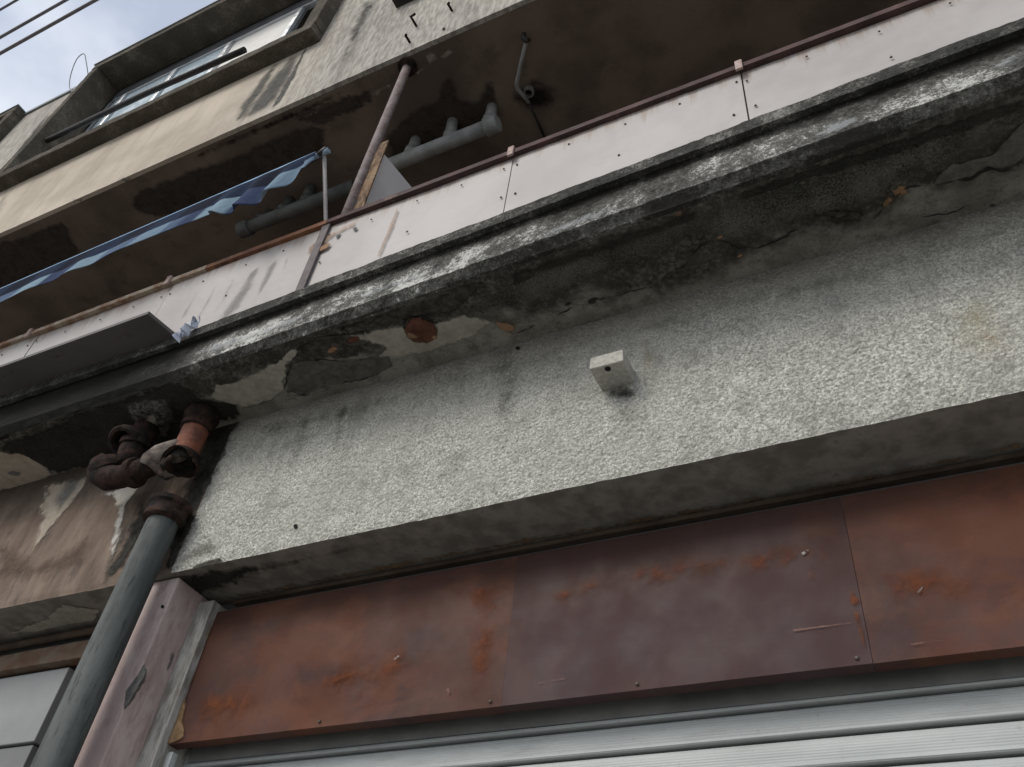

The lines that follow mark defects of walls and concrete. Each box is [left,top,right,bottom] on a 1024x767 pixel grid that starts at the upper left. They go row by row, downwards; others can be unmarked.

leakage [237,49,306,119]
crack [923,194,1015,217]
peeling [210,283,515,407]
corrosion [403,315,437,343]
peeling [0,452,86,545]
peeling [106,487,138,559]
corrosion [167,697,185,744]